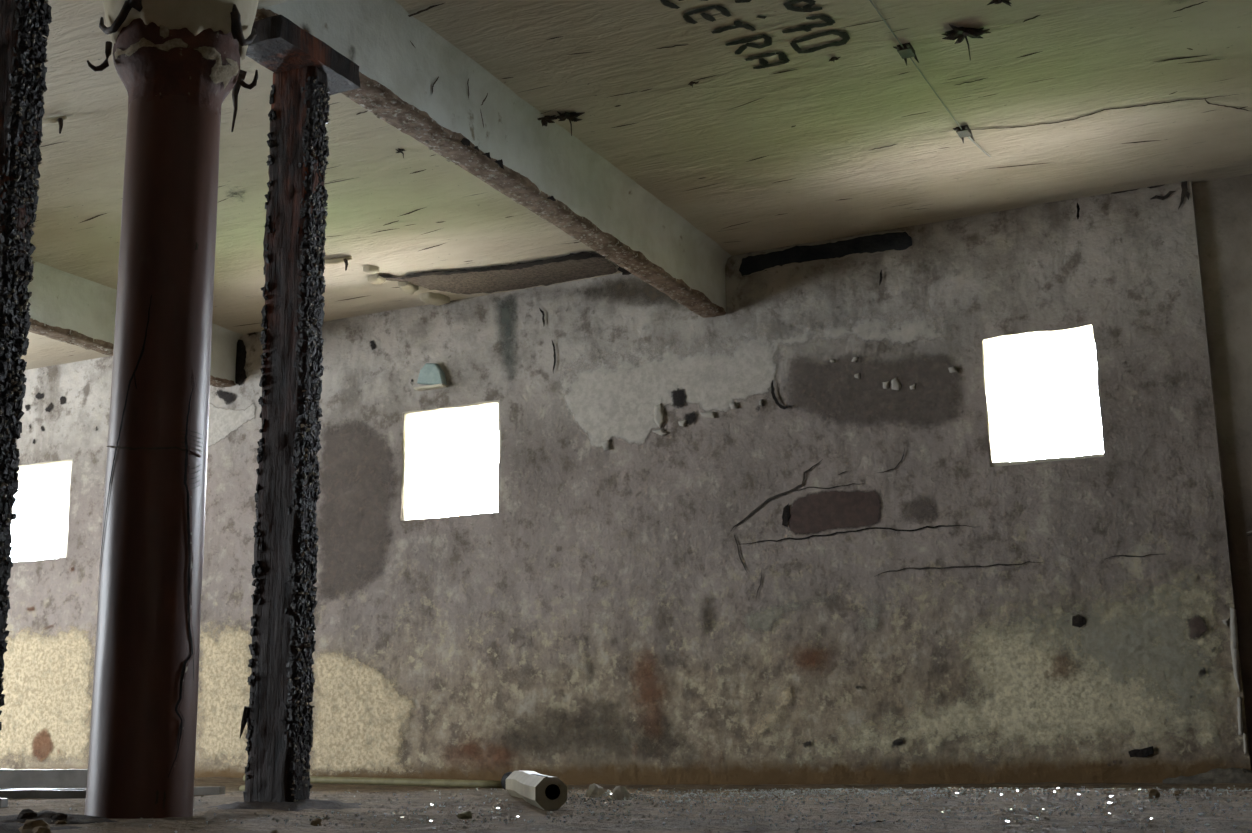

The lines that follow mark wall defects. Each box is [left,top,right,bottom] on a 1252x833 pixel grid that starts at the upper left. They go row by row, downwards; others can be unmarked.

flaking render [114,25,239,91]
crack [943,92,1249,132]
spalling [346,71,726,317]
flaking render [561,311,959,450]
crack [97,295,203,777]
crack [731,449,971,597]
crack [874,561,1043,577]
crack [1106,552,1161,560]